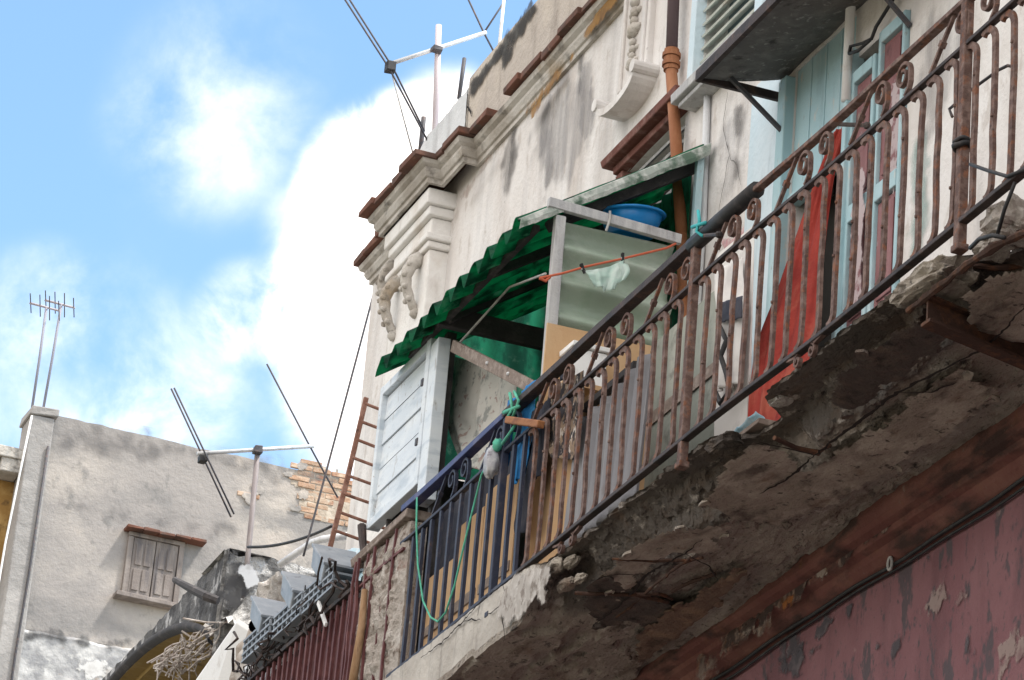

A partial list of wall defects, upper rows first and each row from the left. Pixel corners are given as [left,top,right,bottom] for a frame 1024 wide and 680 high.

damp [470,0,536,96]
damp [501,127,516,190]
crack [714,308,1024,494]
flaking render [284,459,352,527]
peeling [497,369,1001,627]
crack [591,540,718,629]
peeling [633,568,747,662]
peeling [998,626,1024,680]